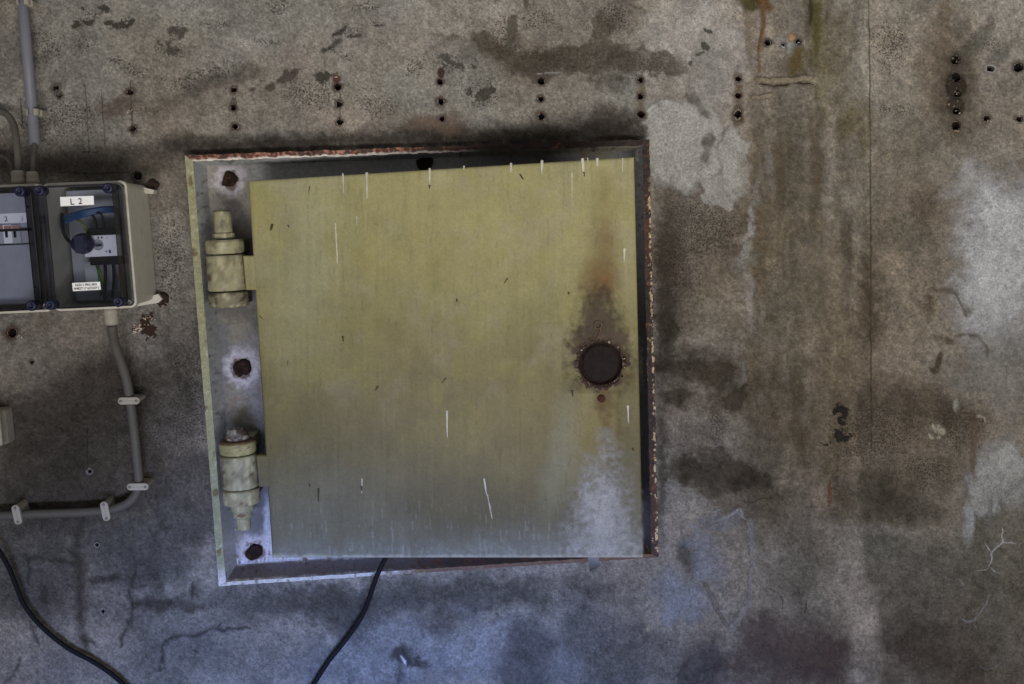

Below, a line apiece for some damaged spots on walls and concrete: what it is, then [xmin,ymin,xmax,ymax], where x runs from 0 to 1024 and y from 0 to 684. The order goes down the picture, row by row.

rust [757,0,771,52]
damp [473,0,807,316]
damp [653,243,746,411]
damp [567,470,639,555]
crack [960,493,1015,622]